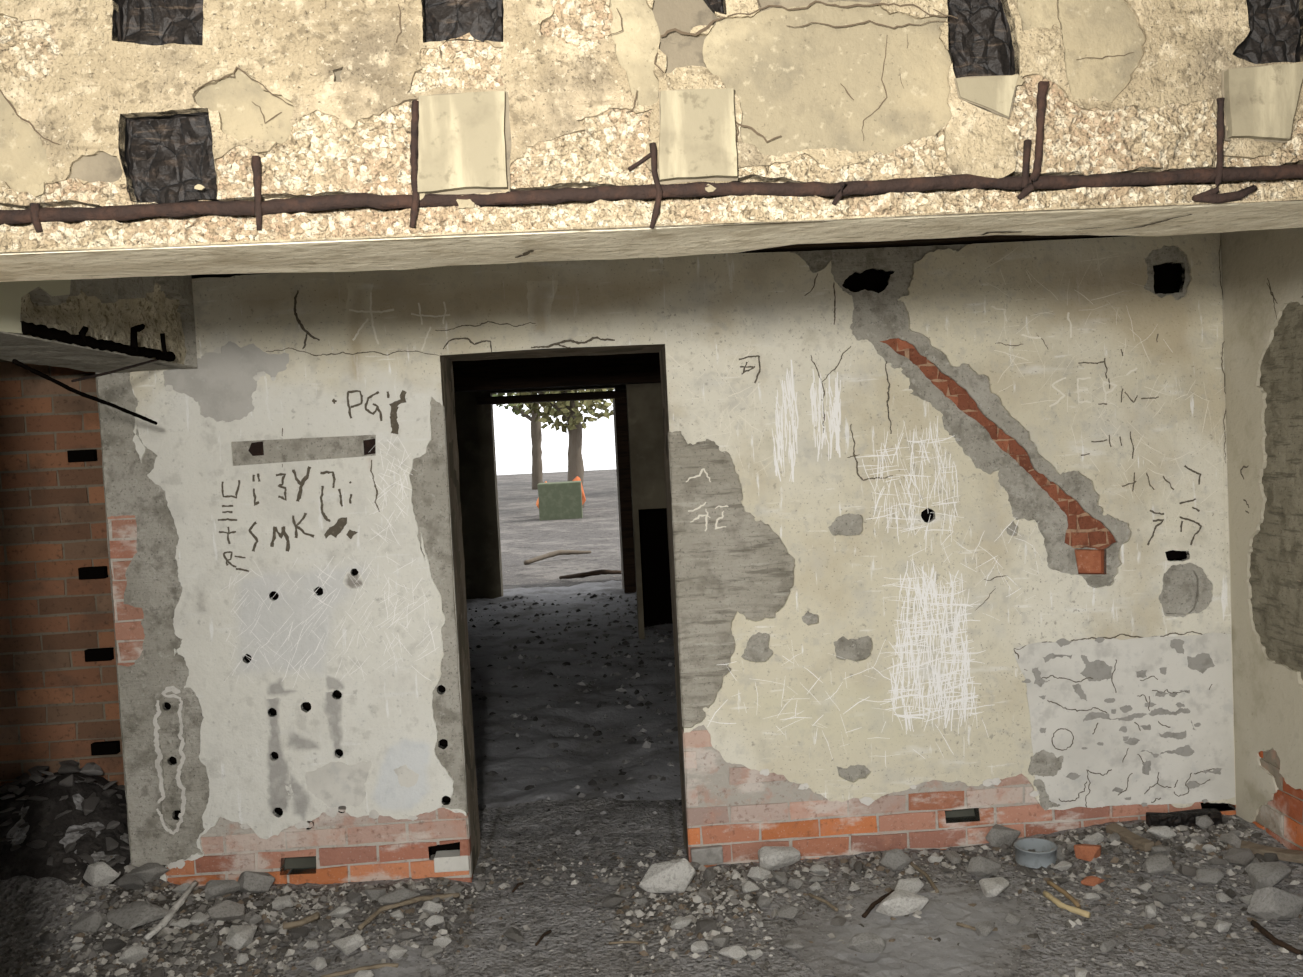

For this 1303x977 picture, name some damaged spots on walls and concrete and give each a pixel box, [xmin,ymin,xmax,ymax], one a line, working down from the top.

spalling [0,0,1303,250]
spalling [16,283,289,422]
spalling [67,372,473,886]
peeling [668,431,1236,867]
spalling [788,244,1131,588]
spalling [1249,296,1303,680]
flaking render [1252,749,1303,851]